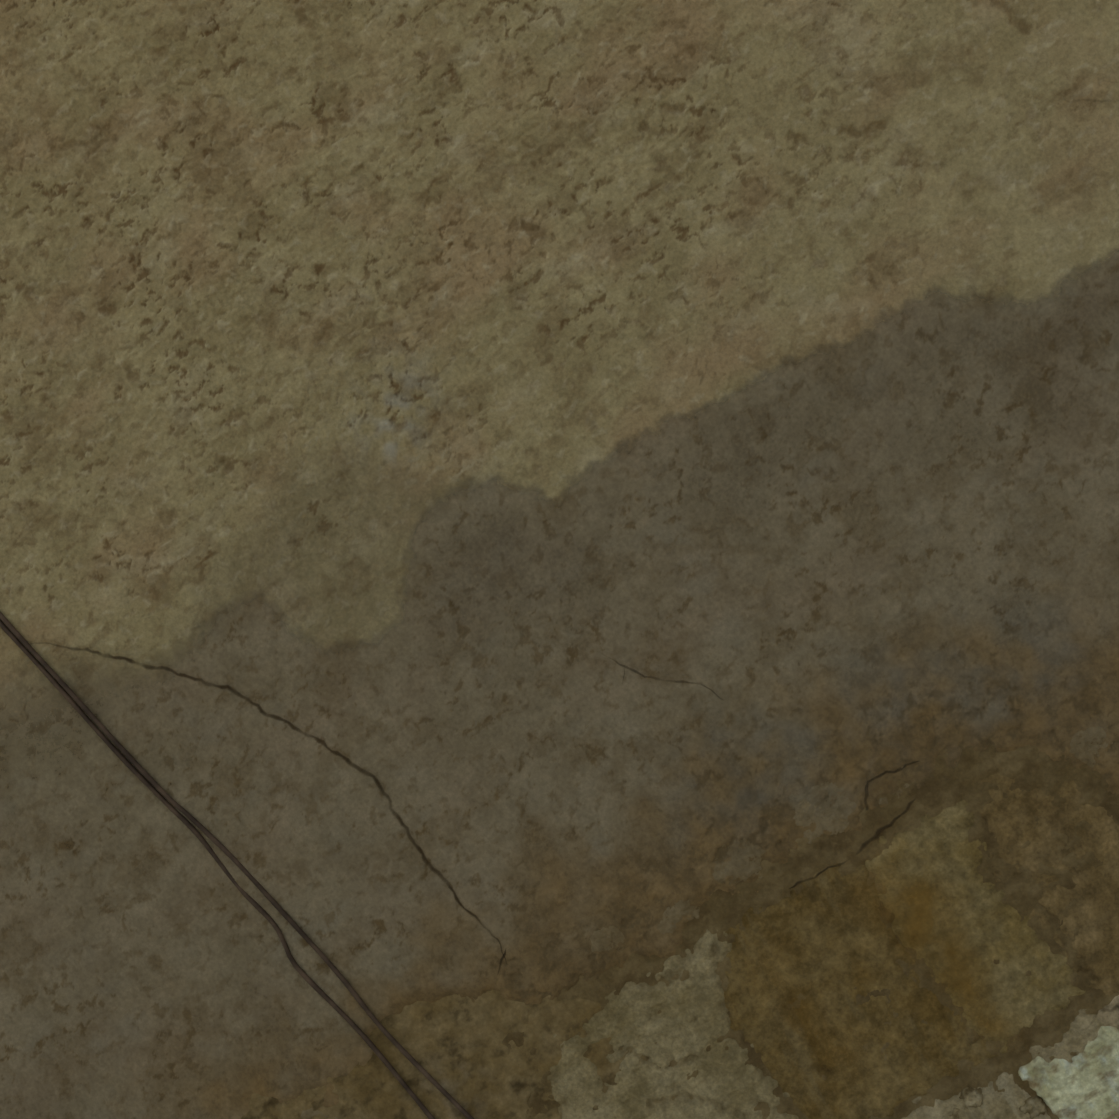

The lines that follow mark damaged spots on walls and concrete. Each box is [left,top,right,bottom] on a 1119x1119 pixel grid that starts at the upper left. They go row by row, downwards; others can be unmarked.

crack [89,650,382,791]
crack [395,814,507,965]
leakage [0,251,1119,1119]
spalling [241,743,1119,1119]